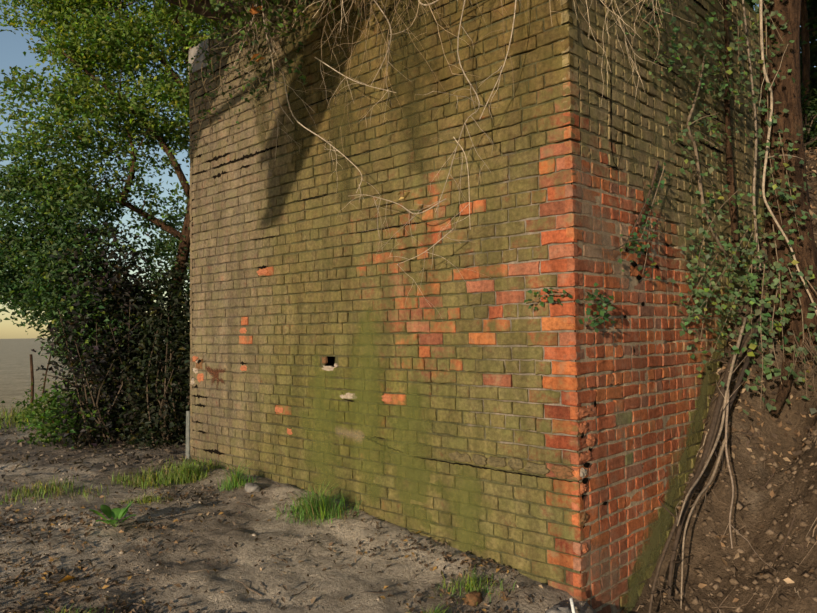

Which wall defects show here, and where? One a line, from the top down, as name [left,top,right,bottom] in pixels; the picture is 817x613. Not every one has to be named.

crack [595,56,623,170]
crack [192,145,281,179]
spalling [322,356,338,371]